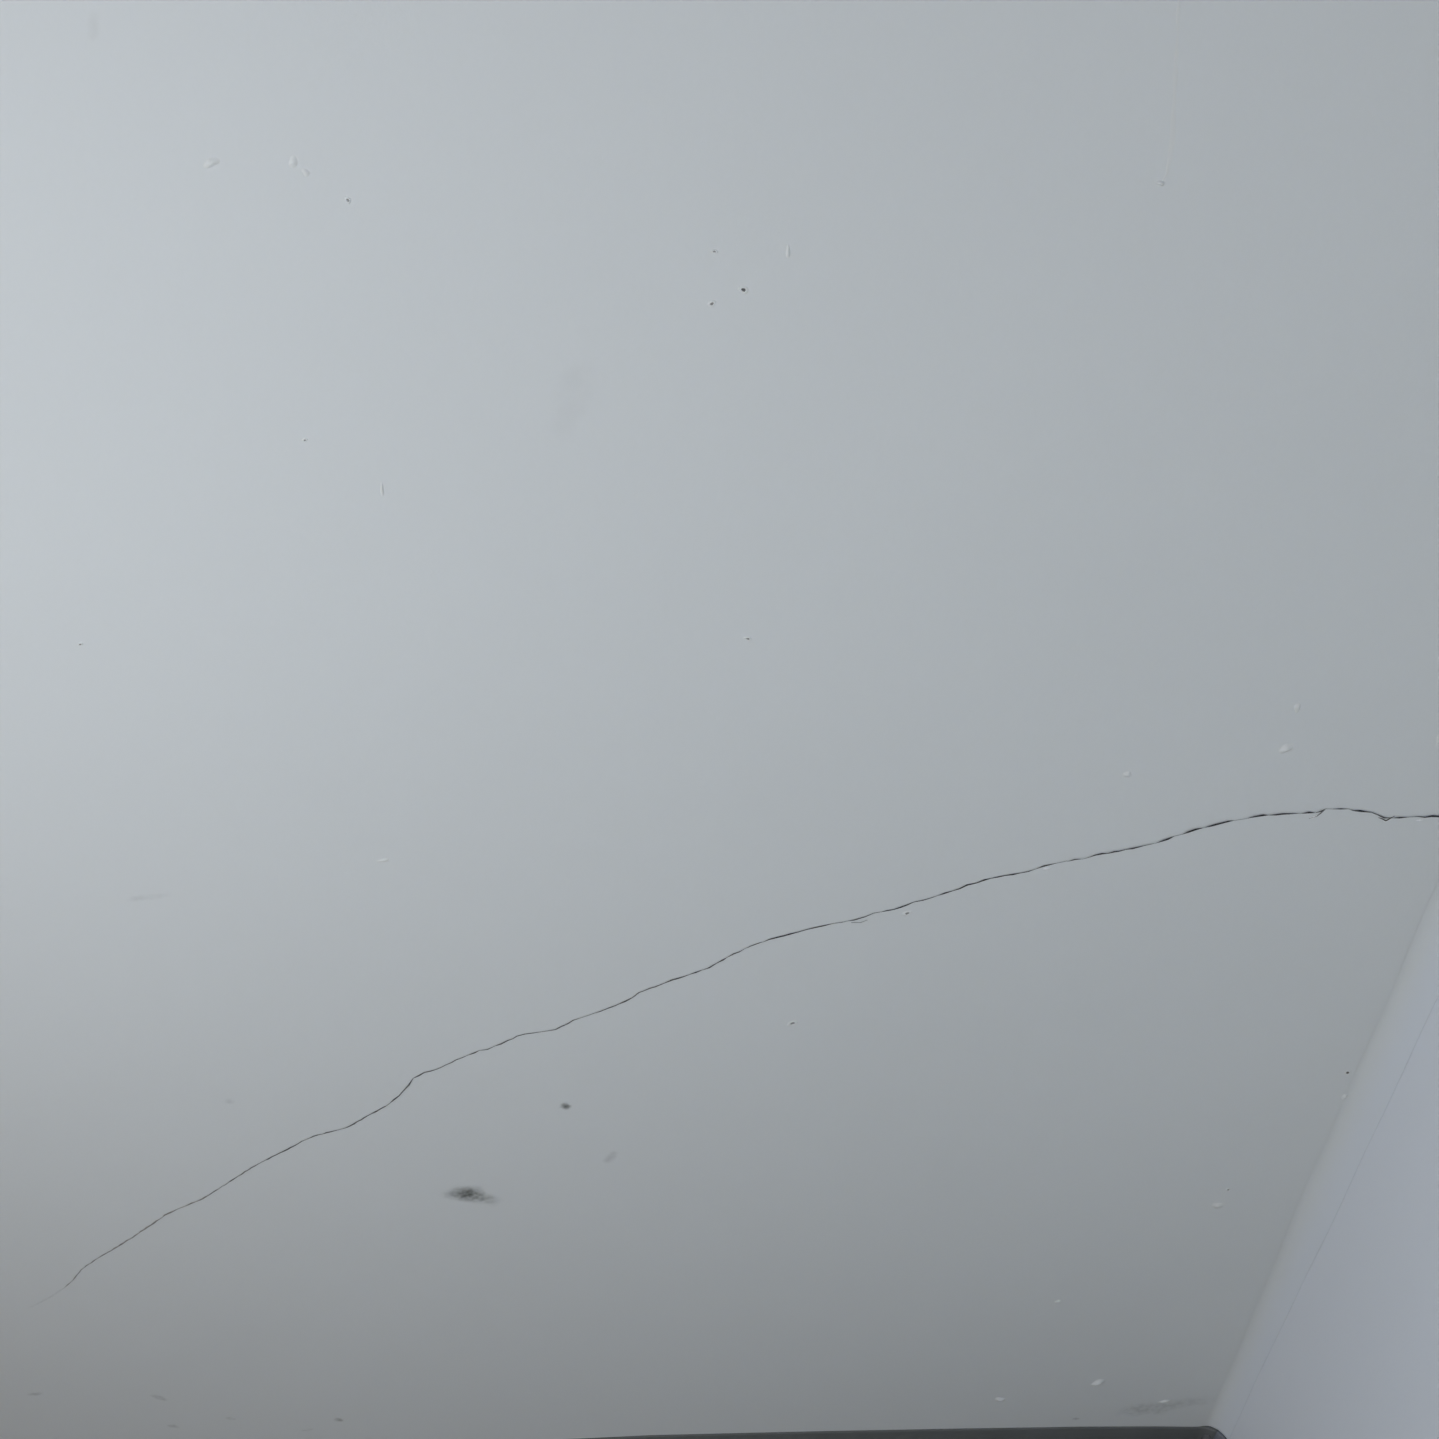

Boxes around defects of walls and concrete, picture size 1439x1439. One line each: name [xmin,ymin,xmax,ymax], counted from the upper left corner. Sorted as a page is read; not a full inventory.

crack [64,808,1439,1288]